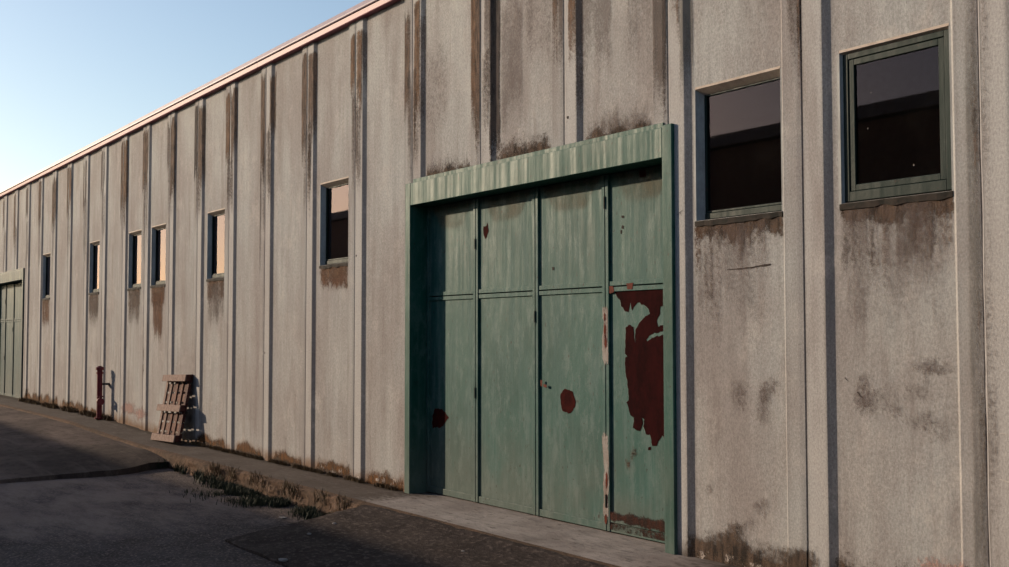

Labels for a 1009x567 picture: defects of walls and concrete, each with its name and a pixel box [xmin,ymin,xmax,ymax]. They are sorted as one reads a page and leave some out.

leakage [301,52,317,202]
leakage [350,29,367,177]
leakage [404,0,426,171]
leakage [471,0,548,161]
leakage [695,216,783,298]
leakage [840,197,954,270]
peeling [432,408,449,428]
peeling [560,388,576,413]
peeling [609,283,664,450]